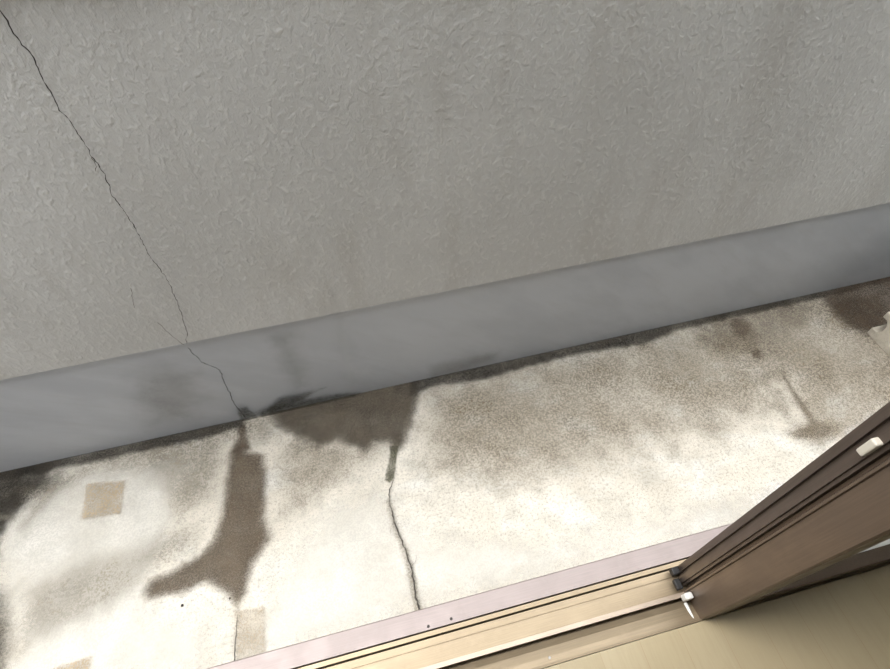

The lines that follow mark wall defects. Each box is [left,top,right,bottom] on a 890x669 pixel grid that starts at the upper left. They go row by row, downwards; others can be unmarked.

crack [0,10,247,419]
water stain [269,277,890,487]
water stain [0,418,266,669]
crack [388,480,422,610]